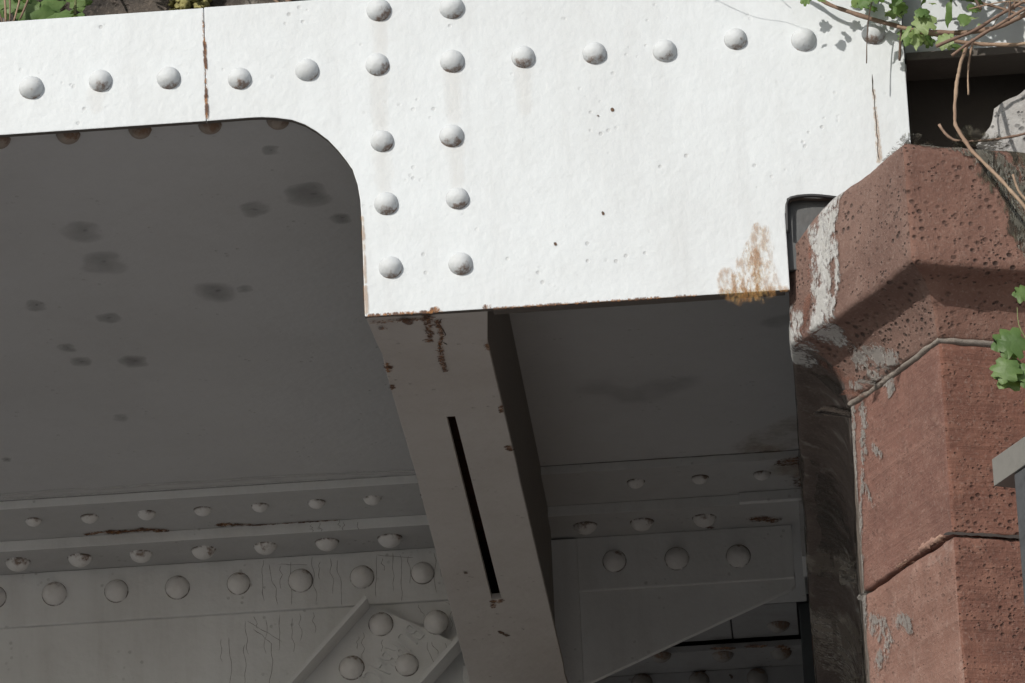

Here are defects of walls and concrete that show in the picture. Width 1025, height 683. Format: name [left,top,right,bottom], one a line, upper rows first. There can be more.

rust [483,296,661,310]
rust [367,307,449,372]
water stain [789,193,913,683]
rust [84,527,169,536]
crack [220,559,342,683]